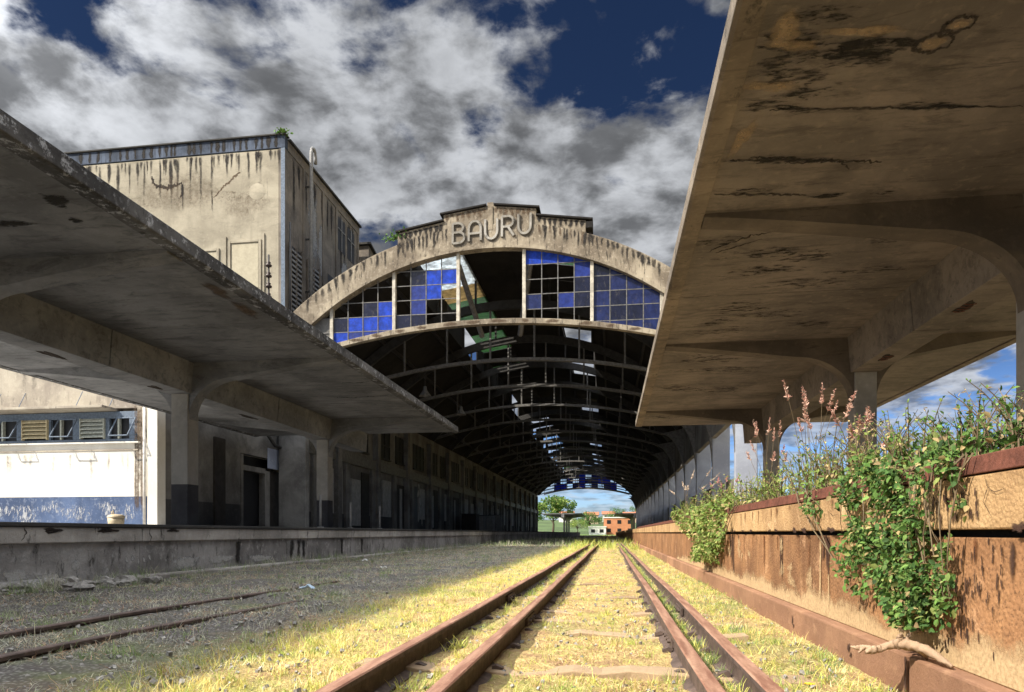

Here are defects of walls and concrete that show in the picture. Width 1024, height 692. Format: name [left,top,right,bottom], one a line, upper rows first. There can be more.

peeling [911,14,979,55]
crack [770,102,1023,115]
crack [151,176,184,198]
leakage [79,136,280,205]
crack [215,172,241,197]
crack [714,156,881,196]
crack [706,232,769,253]
peeling [0,501,134,534]
leakage [677,538,1024,692]